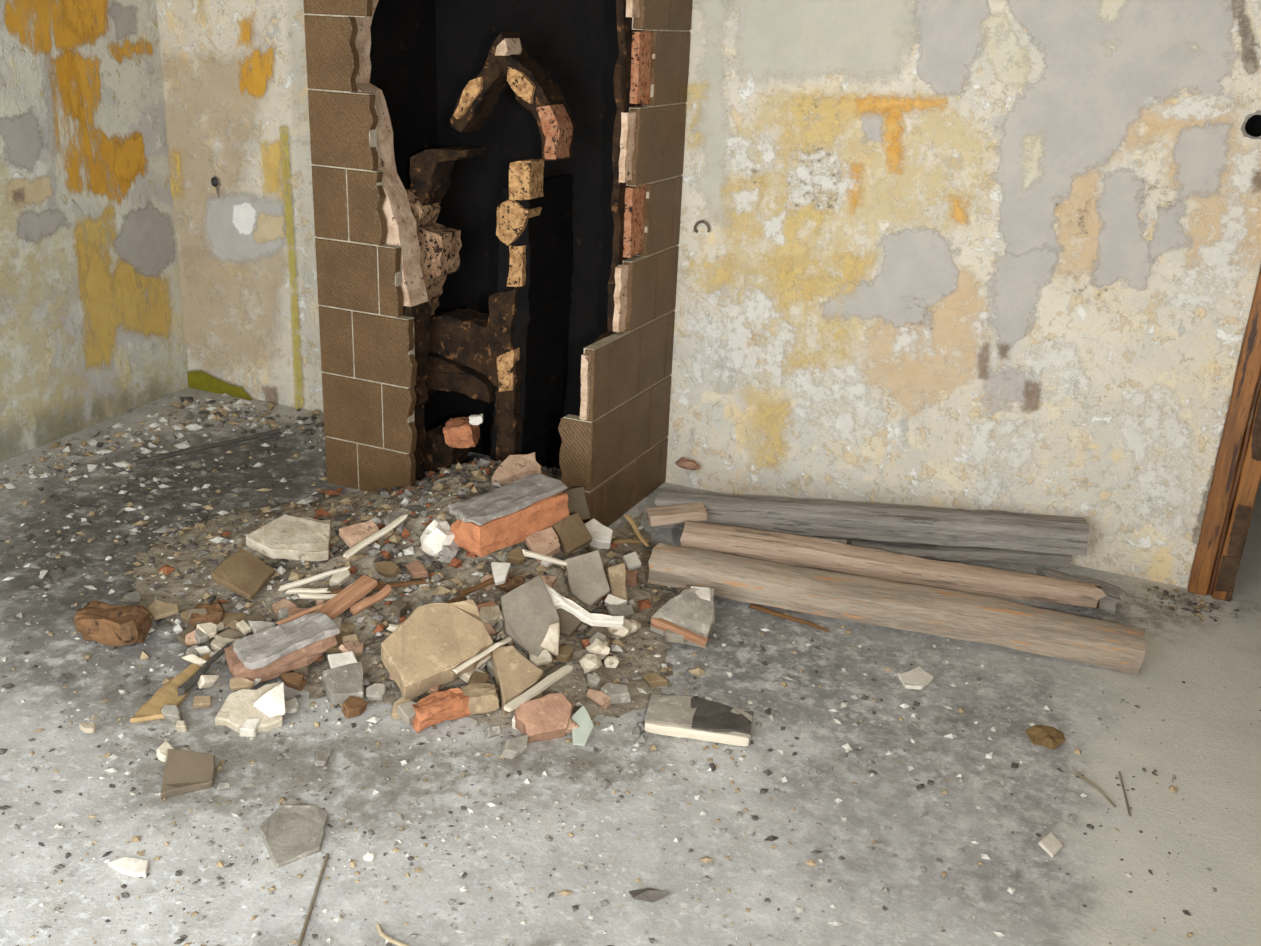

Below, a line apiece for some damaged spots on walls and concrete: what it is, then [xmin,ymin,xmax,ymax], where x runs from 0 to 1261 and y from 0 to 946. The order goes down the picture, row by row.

peeling [0,0,175,278]
flaking render [205,194,285,262]
flaking render [686,289,888,445]
flaking render [725,131,856,245]
peeling [861,111,883,142]
peeling [821,227,960,356]
peeling [913,0,1261,510]
flaking render [1118,385,1217,544]